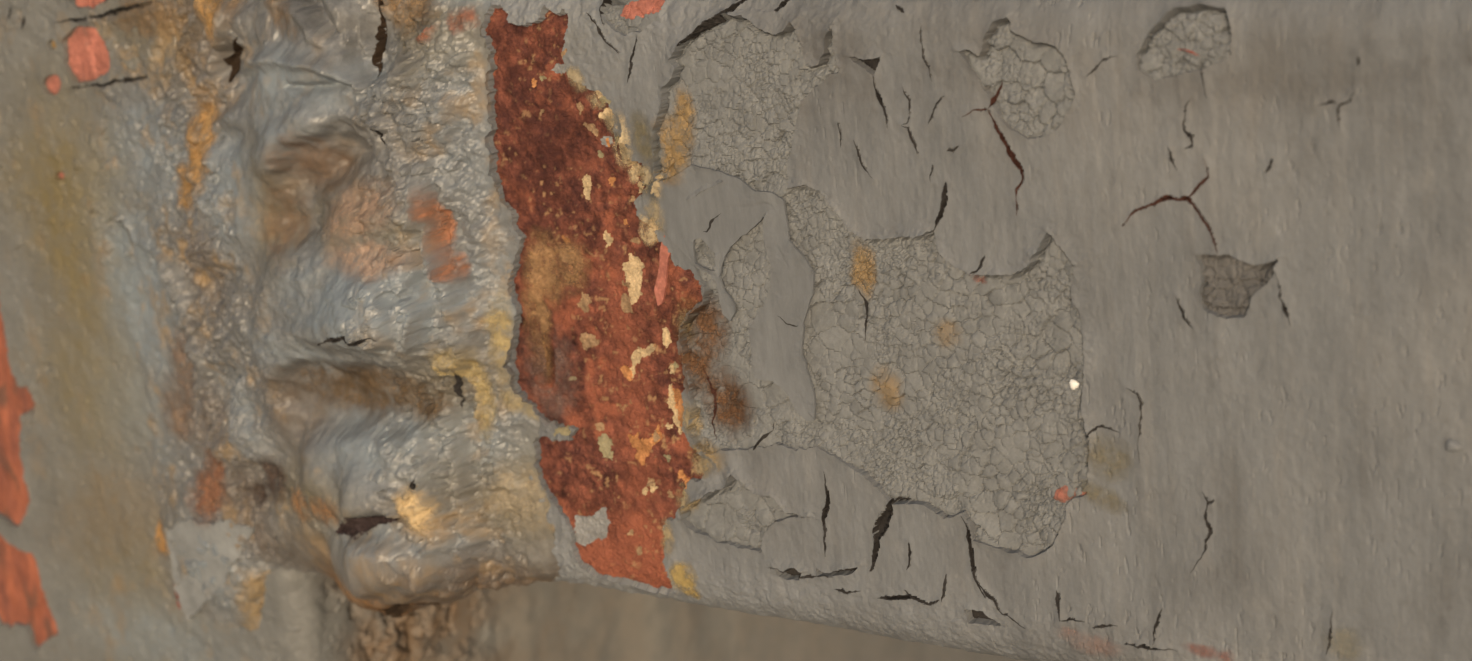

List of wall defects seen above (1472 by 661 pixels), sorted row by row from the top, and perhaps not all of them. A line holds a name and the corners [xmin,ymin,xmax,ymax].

peeling [1139,9,1231,81]
crack [837,122,872,178]
crack [873,5,1024,232]
crack [1122,49,1218,254]
crack [1320,57,1359,126]
corrosion [304,8,745,597]
peeling [642,17,1089,556]
peeling [1201,254,1278,316]
crack [771,471,1025,629]
crack [1190,492,1213,573]
crack [1055,590,1178,652]